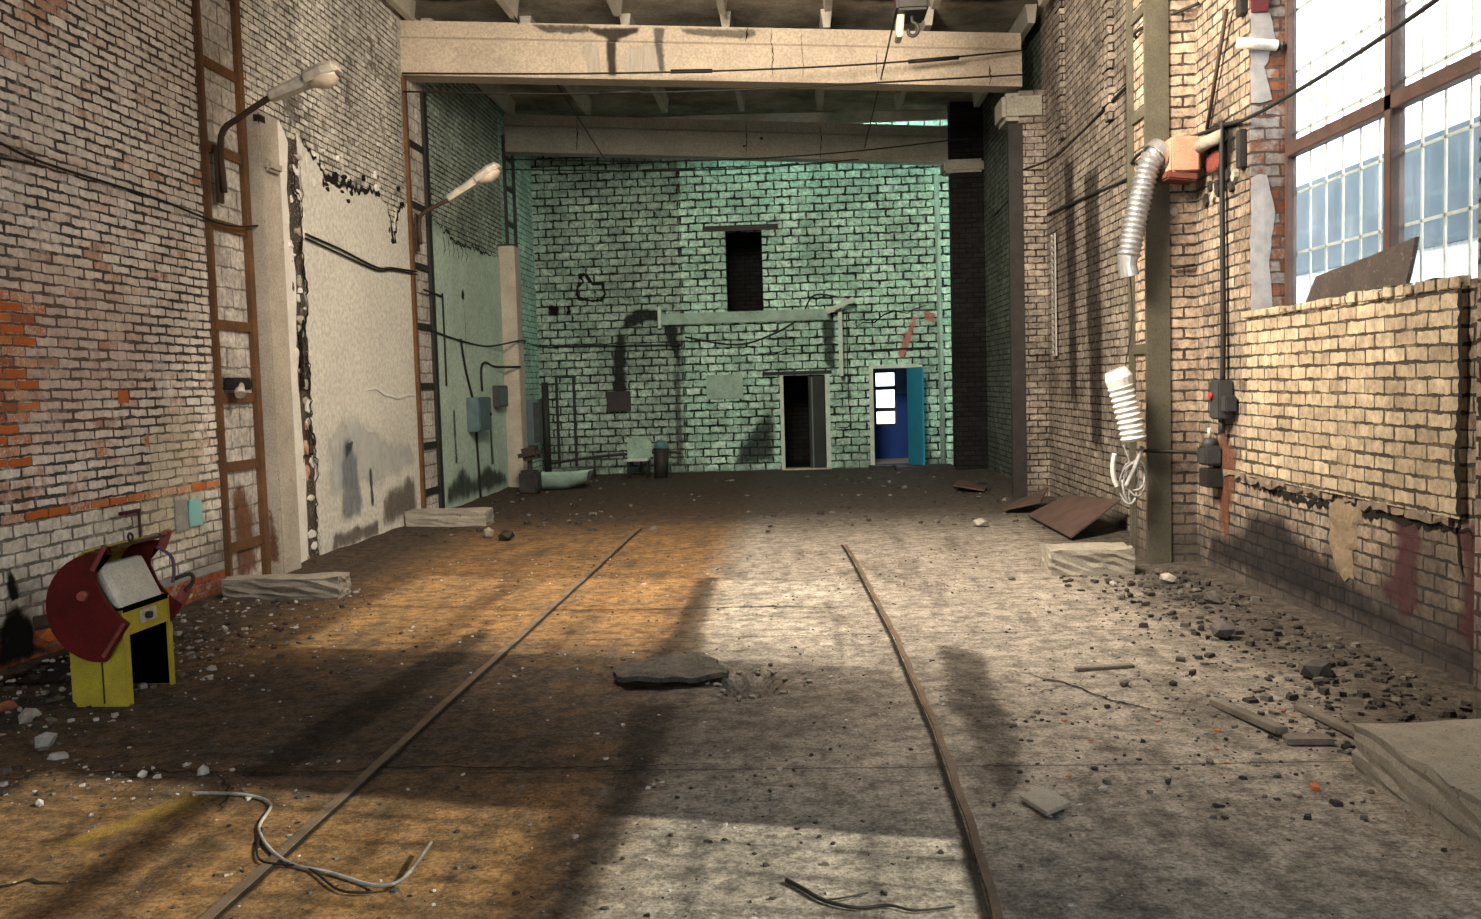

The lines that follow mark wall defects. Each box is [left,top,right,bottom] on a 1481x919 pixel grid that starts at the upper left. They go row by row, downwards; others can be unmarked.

peeling [0,290,46,468]
flaking render [277,121,406,563]
damp [330,425,415,549]
damp [1212,519,1372,616]
crack [1454,282,1464,584]